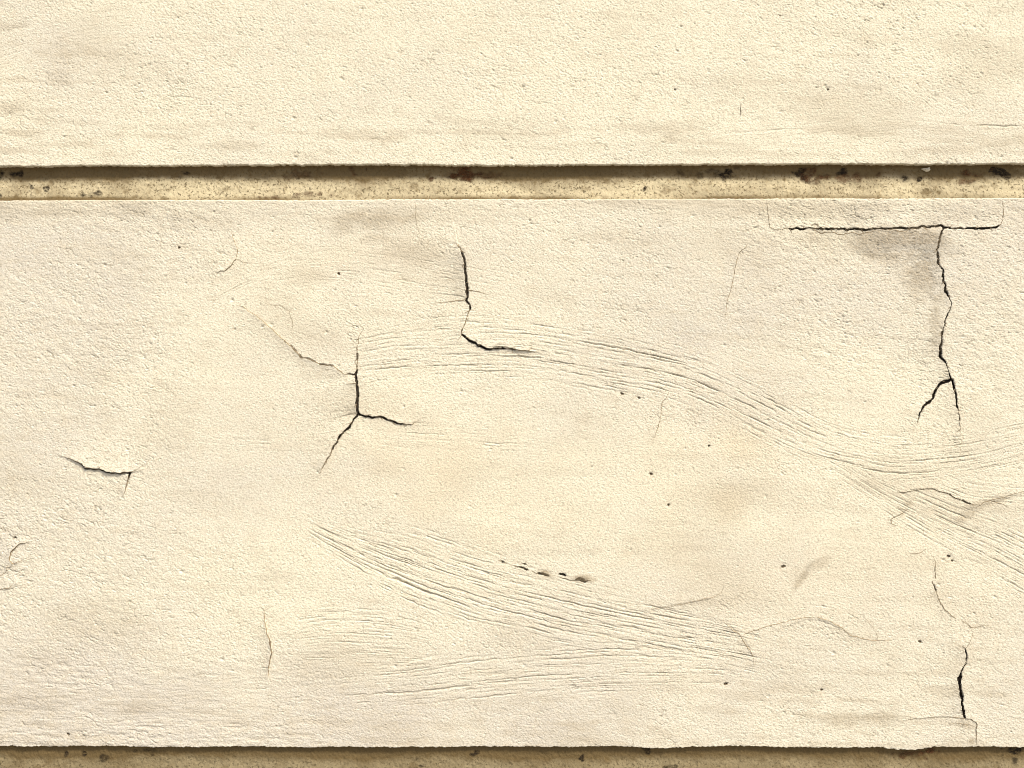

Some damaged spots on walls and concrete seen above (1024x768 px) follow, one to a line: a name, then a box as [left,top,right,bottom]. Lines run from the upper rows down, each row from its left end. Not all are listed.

crack [237,304,413,473]
crack [438,243,535,353]
crack [767,207,1004,452]
crack [68,458,143,493]
crack [903,549,980,743]